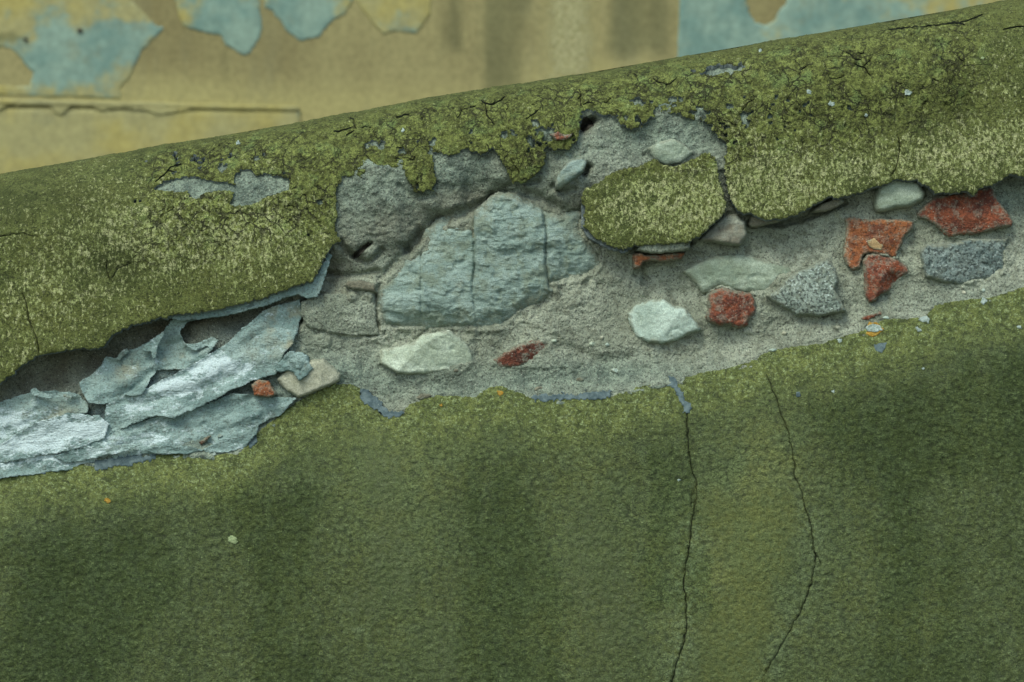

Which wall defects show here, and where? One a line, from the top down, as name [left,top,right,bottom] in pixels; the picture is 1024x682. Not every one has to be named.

peeling [0,0,190,115]
peeling [175,0,431,55]
peeling [678,0,1001,57]
spalling [0,106,1024,479]